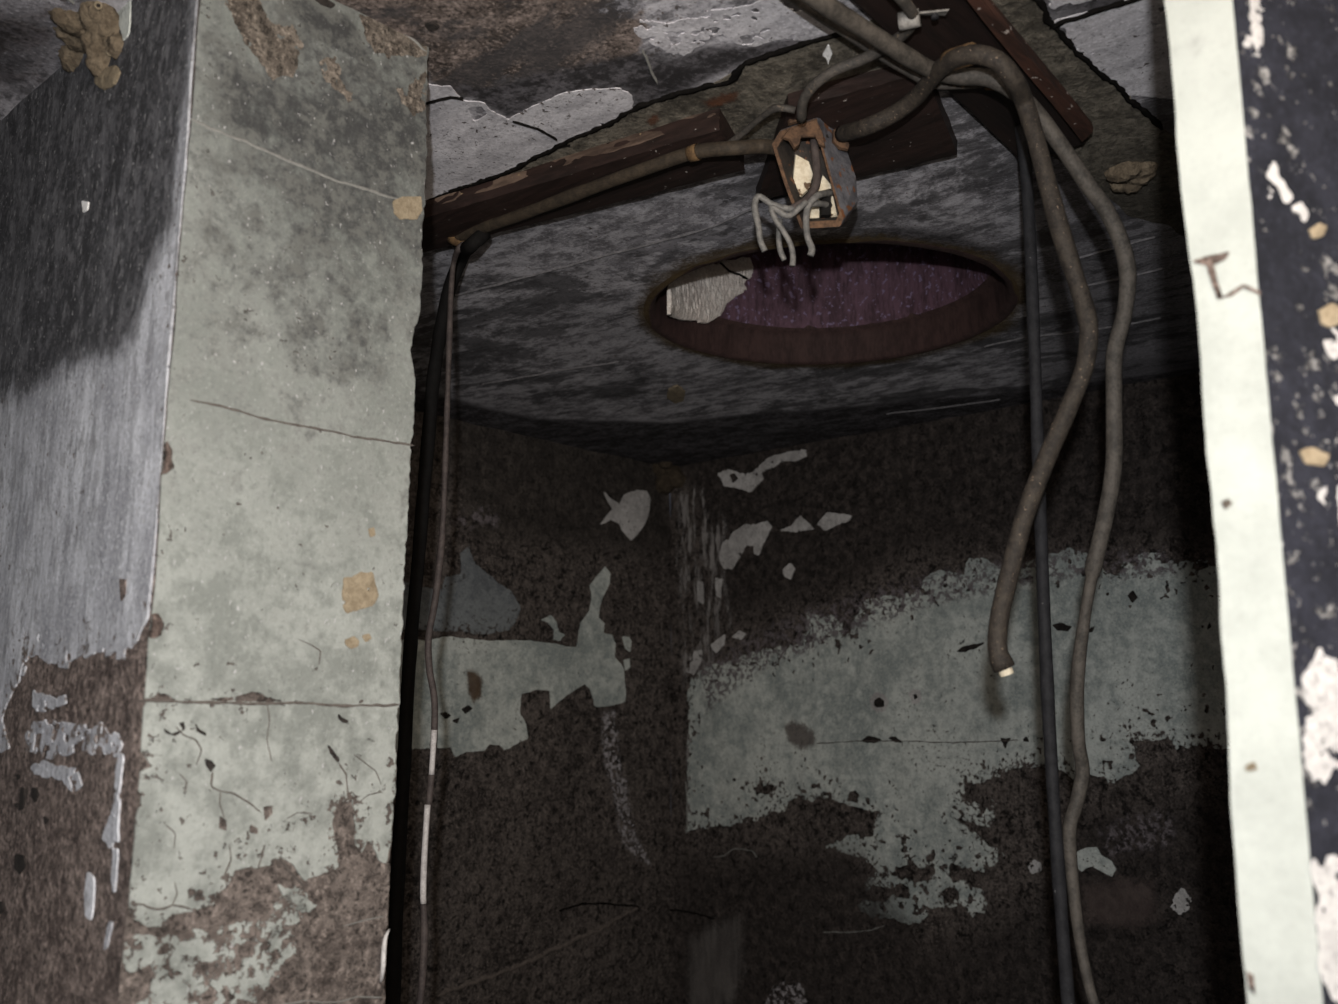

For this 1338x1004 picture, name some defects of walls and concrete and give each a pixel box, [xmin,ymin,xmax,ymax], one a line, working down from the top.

peeling [1243,0,1264,57]
peeling [1266,161,1309,222]
peeling [1323,328,1338,360]
crack [190,400,415,447]
peeling [0,0,889,1004]
peeling [1317,477,1338,505]
peeling [677,489,1229,925]
peeling [1300,648,1338,784]
crack [139,698,400,886]
crack [131,884,193,910]
peeling [1310,854,1338,1002]
spalling [1246,971,1256,995]